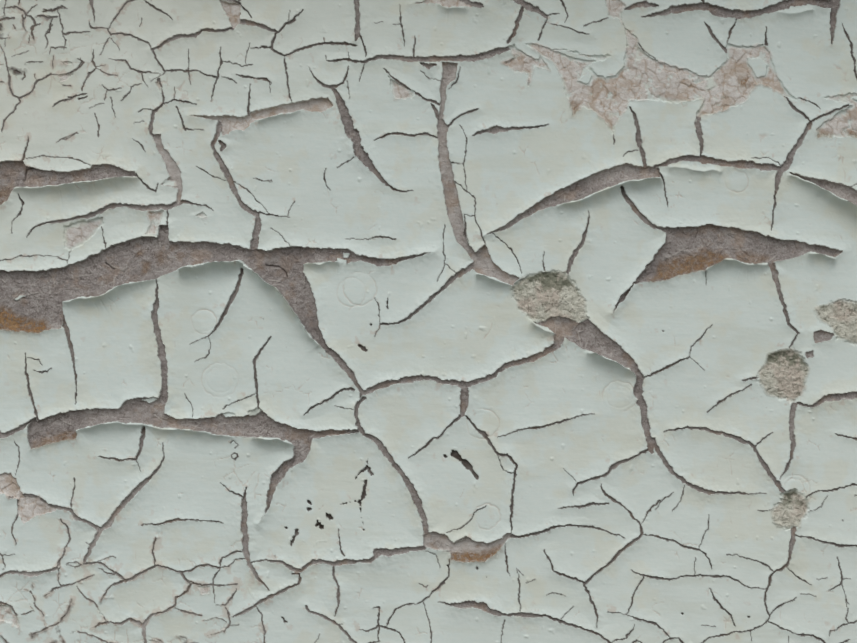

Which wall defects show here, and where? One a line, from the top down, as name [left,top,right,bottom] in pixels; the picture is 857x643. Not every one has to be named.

spalling [0,160,136,205]
spalling [153,134,183,203]
crack [0,0,857,362]
peeling [504,0,797,135]
peeling [816,92,857,138]
crack [151,278,194,417]
spalling [0,210,431,350]
spalling [613,224,843,312]
crack [0,314,857,643]
spalling [423,531,511,570]